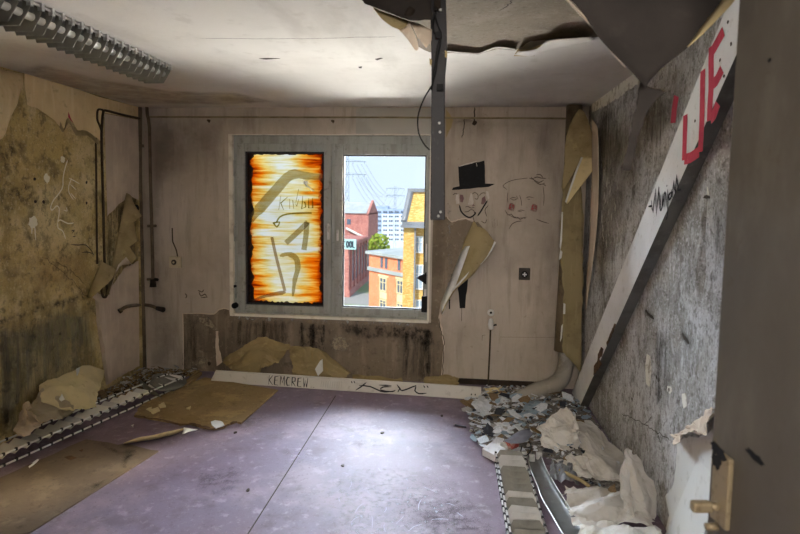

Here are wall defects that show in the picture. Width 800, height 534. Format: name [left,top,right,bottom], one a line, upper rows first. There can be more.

damp [301,320,325,348]
damp [343,321,431,378]